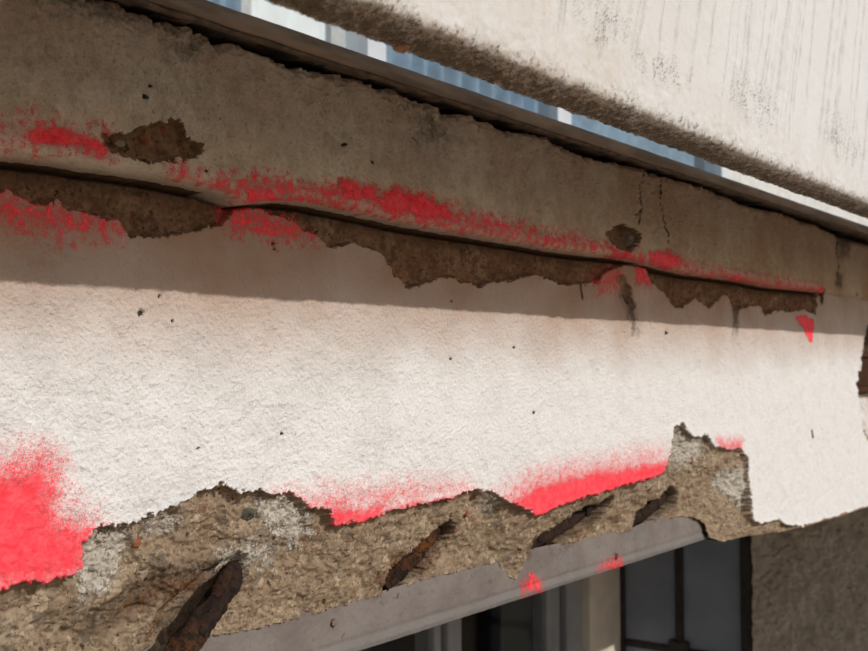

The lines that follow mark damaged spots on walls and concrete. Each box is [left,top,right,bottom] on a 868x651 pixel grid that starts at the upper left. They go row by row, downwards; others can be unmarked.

spalling [101,117,205,165]
flaking render [0,161,818,316]
crack [635,168,671,249]
spalling [0,422,868,651]